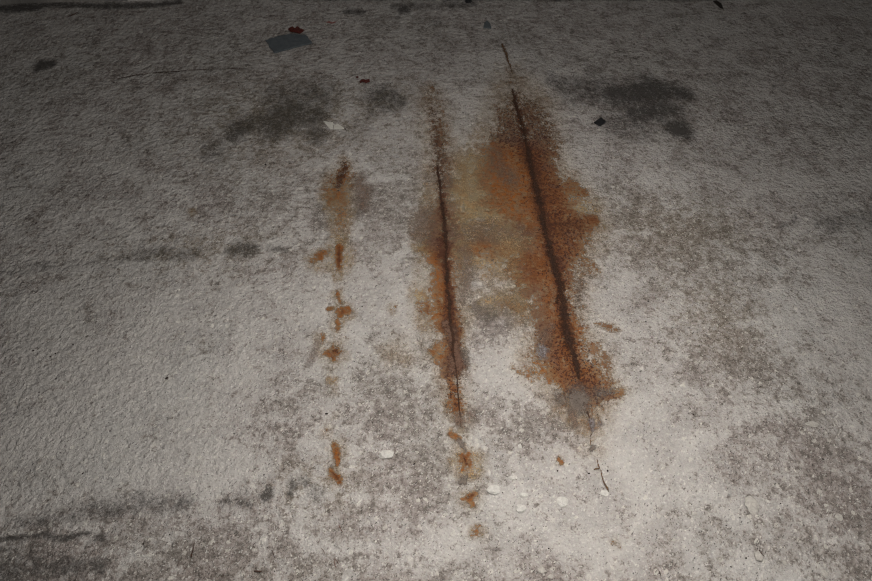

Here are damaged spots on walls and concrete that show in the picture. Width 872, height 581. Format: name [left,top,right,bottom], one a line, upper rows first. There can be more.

corrosion [309,290,354,362]
corrosion [309,158,371,278]
crack [436,166,461,427]
corrosion [409,68,627,479]
crack [501,43,581,379]
corrosion [323,429,343,485]
corrosion [460,491,479,508]